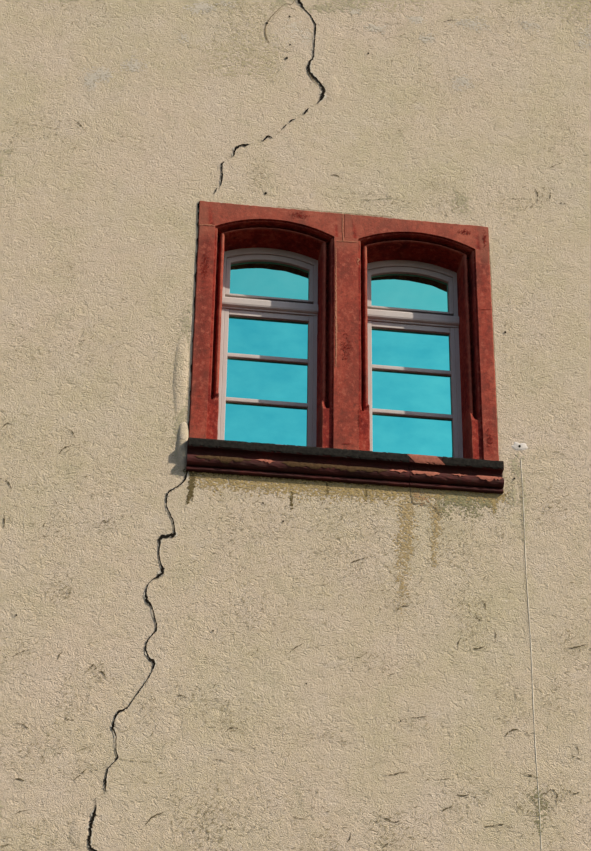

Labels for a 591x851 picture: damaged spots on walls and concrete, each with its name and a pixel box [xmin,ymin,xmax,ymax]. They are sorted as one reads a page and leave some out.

crack [194,0,327,308]
crack [87,471,189,851]
leakage [183,469,511,614]
spalling [390,454,445,476]